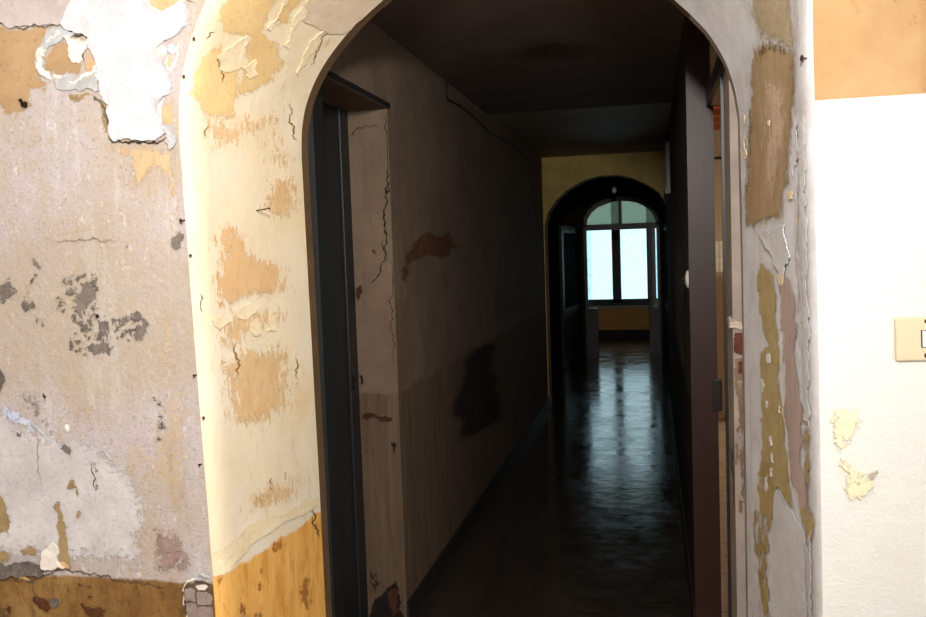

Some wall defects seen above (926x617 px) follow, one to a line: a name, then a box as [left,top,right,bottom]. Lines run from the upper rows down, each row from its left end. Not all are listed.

peeling [0,0,192,150]
peeling [188,0,383,219]
damp [0,258,44,327]
damp [54,264,183,374]
crack [349,113,395,366]
flaking render [0,496,11,533]
damp [141,386,201,578]
flaking render [182,471,322,617]
flaking render [368,568,404,617]
peeling [727,224,814,617]